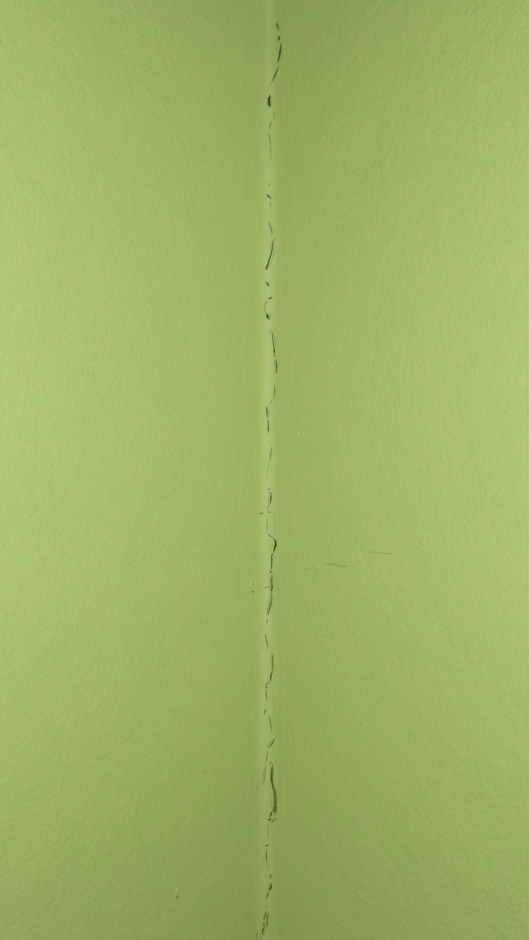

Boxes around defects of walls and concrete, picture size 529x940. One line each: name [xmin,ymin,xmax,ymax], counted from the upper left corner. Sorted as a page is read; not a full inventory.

crack [271,23,281,82]
crack [265,222,277,458]
crack [260,488,276,762]
crack [262,845,272,935]